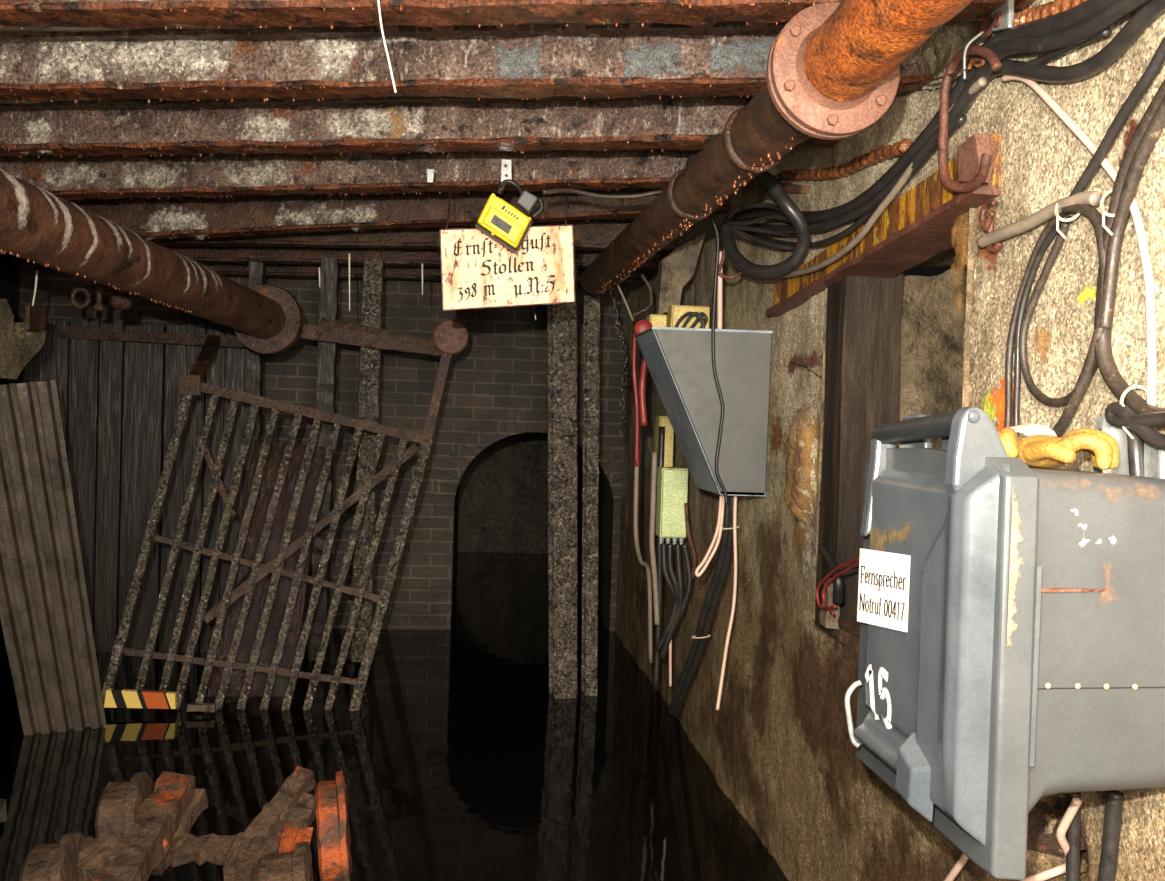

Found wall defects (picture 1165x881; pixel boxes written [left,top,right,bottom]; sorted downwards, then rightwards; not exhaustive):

corrosion [75,273,192,313]
corrosion [598,95,810,294]
leakage [715,523,786,800]
leakage [792,616,876,833]